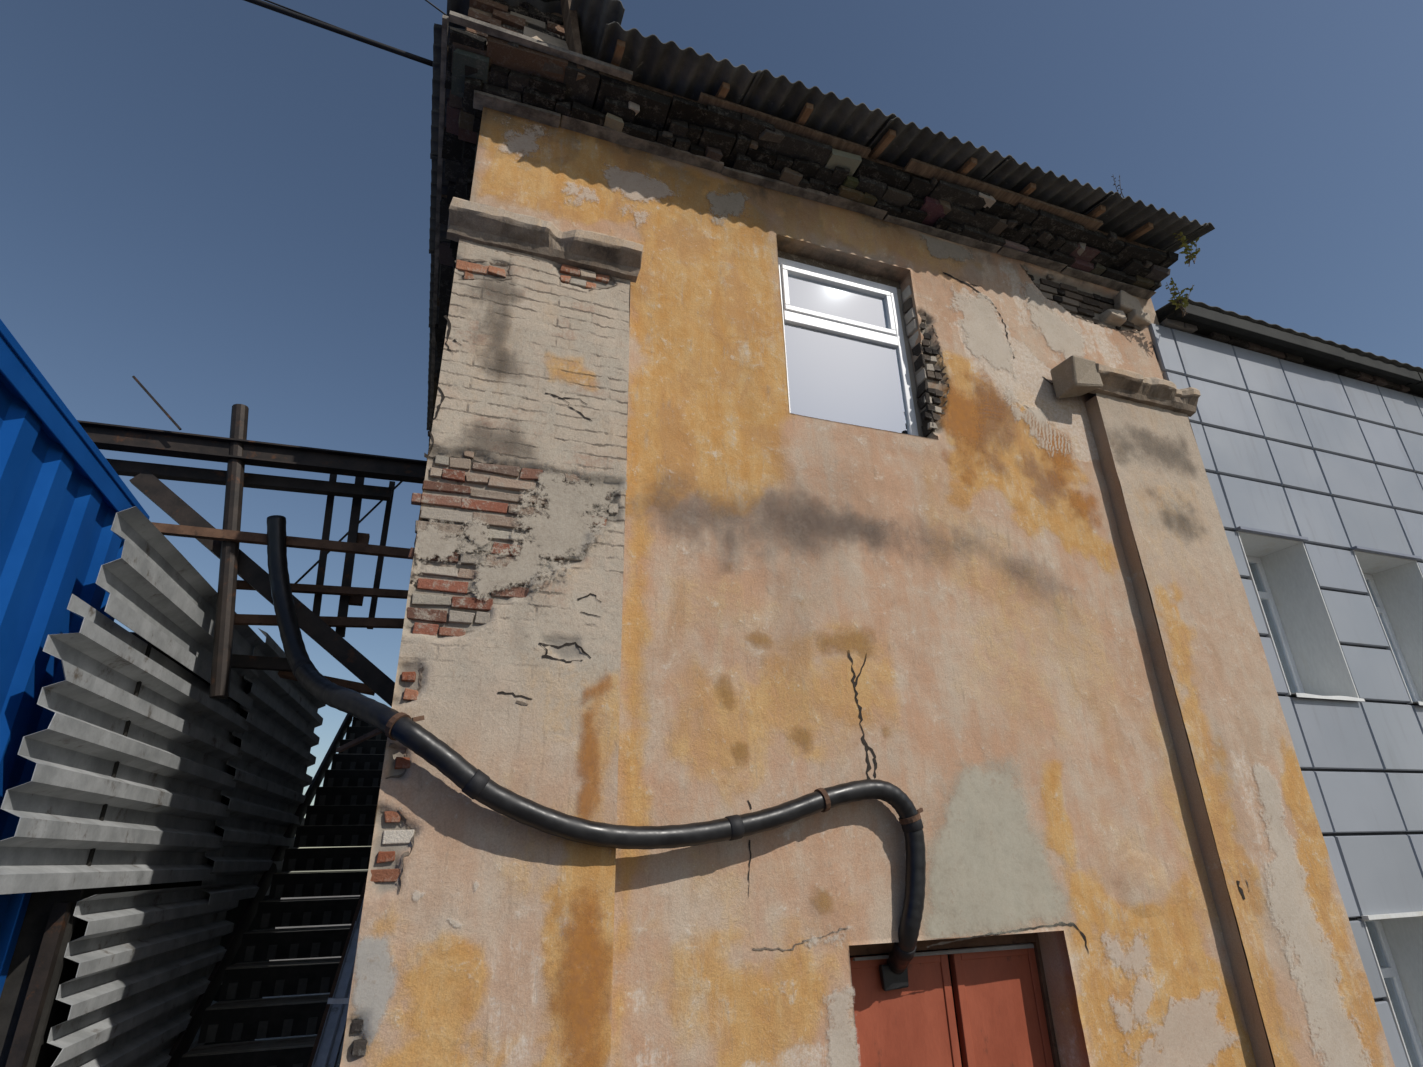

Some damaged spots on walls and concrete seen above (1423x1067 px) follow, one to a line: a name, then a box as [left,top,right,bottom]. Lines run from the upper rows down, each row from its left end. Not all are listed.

peeling [562,165,673,225]
flaking render [455,259,512,280]
flaking render [560,264,617,291]
flaking render [1020,264,1151,359]
spalling [902,285,950,437]
peeling [950,286,1072,457]
flaking render [407,451,627,640]
spalling [401,663,424,702]
peeling [539,642,591,663]
crack [825,634,877,779]
spalling [370,811,424,901]
peeling [1102,931,1239,1067]